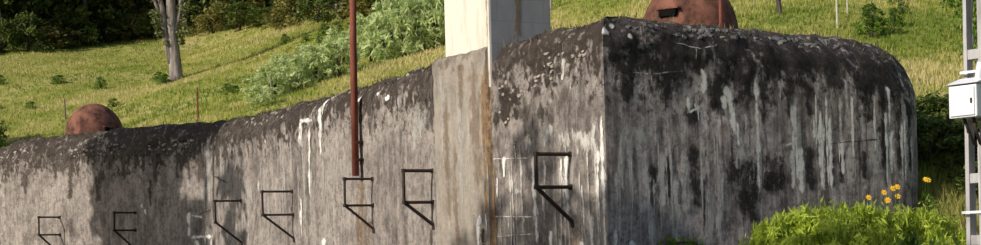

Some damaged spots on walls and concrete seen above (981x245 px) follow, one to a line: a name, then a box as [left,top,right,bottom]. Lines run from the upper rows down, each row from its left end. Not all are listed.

water stain [53,164,79,199]
water stain [476,214,487,245]